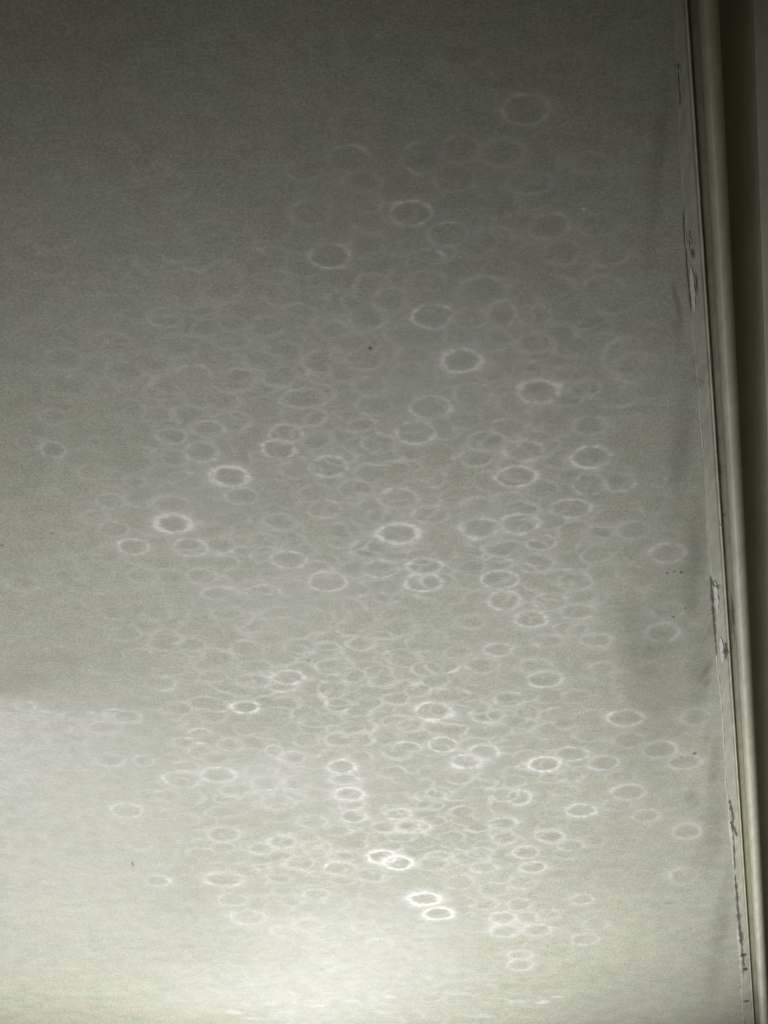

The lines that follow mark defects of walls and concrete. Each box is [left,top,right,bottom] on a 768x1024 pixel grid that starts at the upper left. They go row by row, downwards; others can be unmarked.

damp [393,274,602,446]
damp [154,413,258,505]
damp [259,410,382,479]
damp [145,495,283,599]
damp [349,416,637,770]
damp [227,700,261,714]
damp [160,721,312,806]
damp [296,757,369,827]
damp [365,848,419,882]
damp [403,890,456,921]
damp [470,788,565,873]
damp [524,746,621,782]